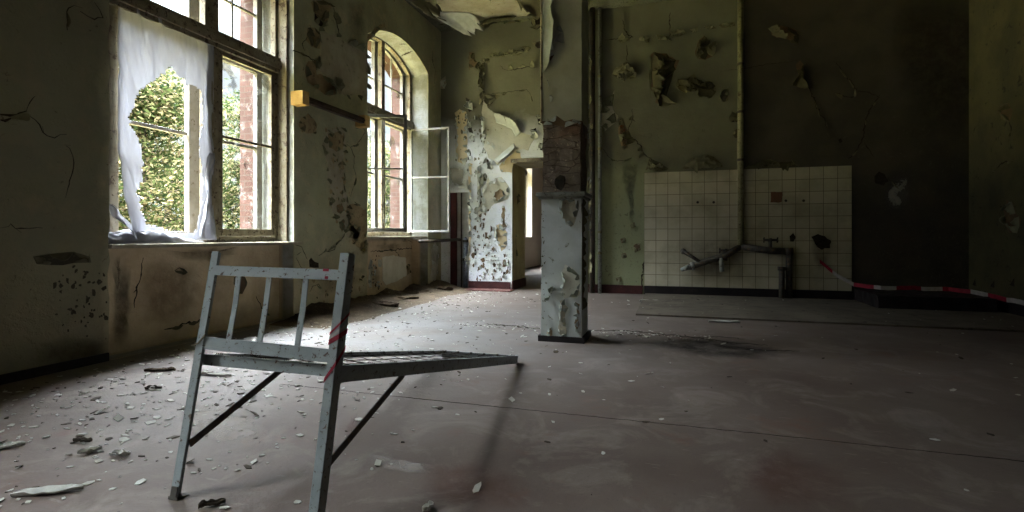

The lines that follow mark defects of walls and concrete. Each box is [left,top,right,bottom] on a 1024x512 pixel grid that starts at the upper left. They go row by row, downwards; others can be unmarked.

spalling [305,0,386,100]
peeling [418,0,564,73]
peeling [612,32,737,138]
crack [0,96,75,198]
spalling [298,113,368,251]
flaking render [454,52,629,336]
spalling [33,252,108,337]
crack [133,260,143,308]